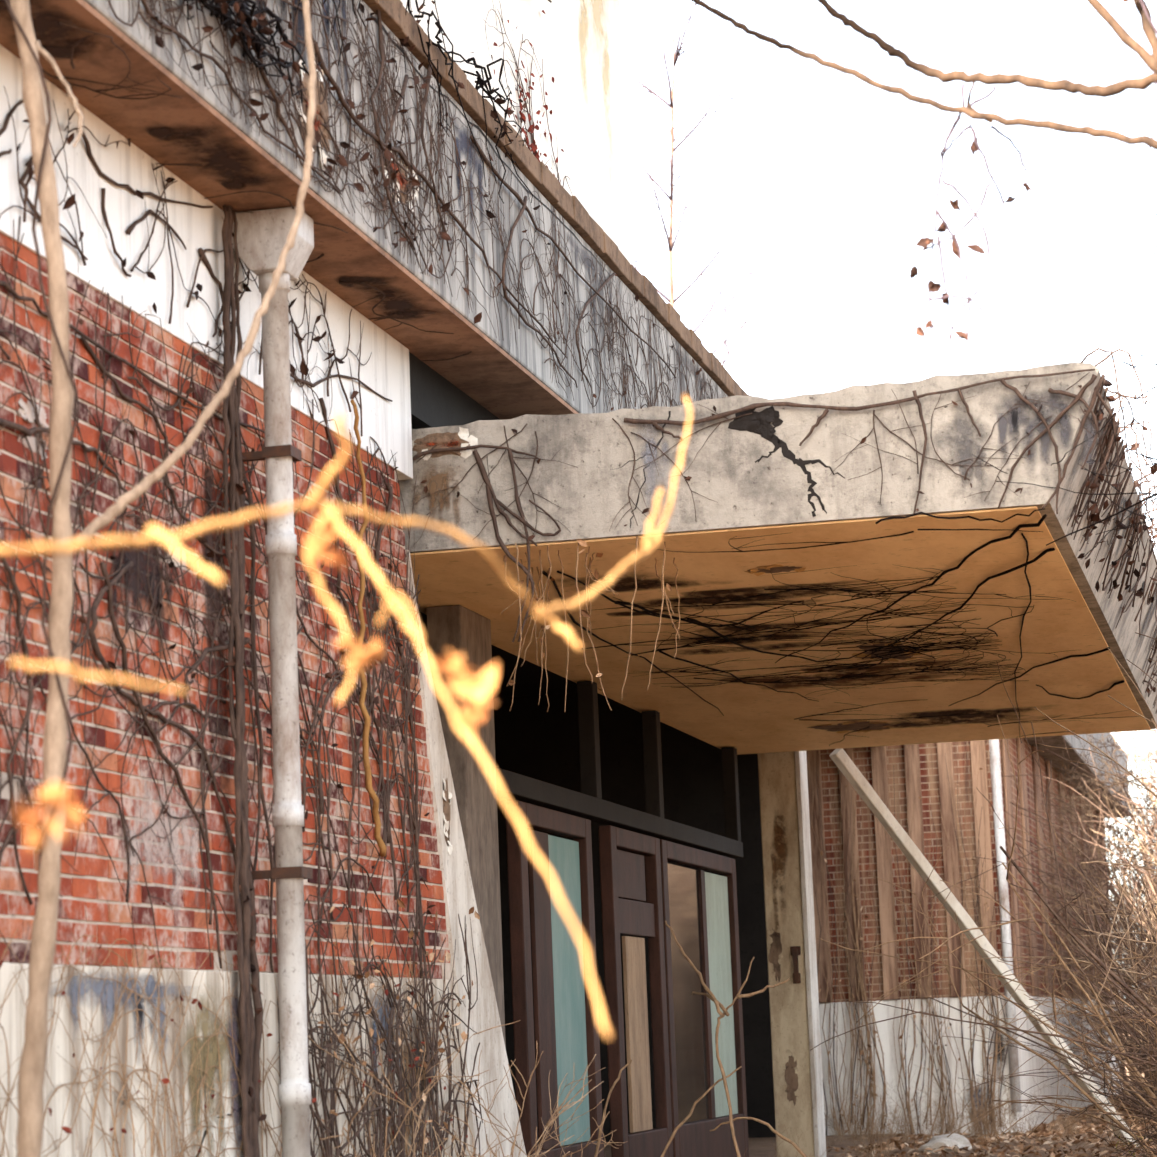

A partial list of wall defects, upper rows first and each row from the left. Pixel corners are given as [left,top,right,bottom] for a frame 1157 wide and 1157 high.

leakage [147,127,268,189]
leakage [337,277,422,319]
spalling [412,427,478,461]
crack [755,434,845,517]
leakage [575,576,854,616]
leakage [687,621,844,654]
leakage [724,661,948,689]
leakage [888,708,1029,728]